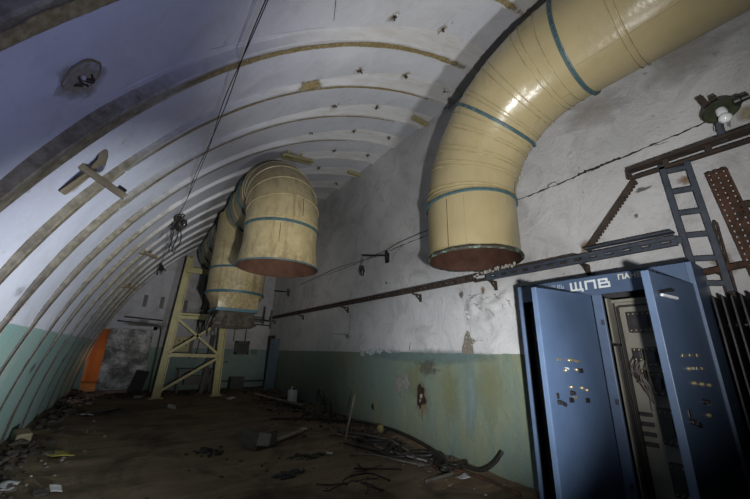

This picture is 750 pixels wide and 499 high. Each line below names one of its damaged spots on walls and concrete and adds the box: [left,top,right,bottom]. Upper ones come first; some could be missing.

crack [518,122,705,200]
peeling [360,327,484,363]
spalling [396,372,427,421]